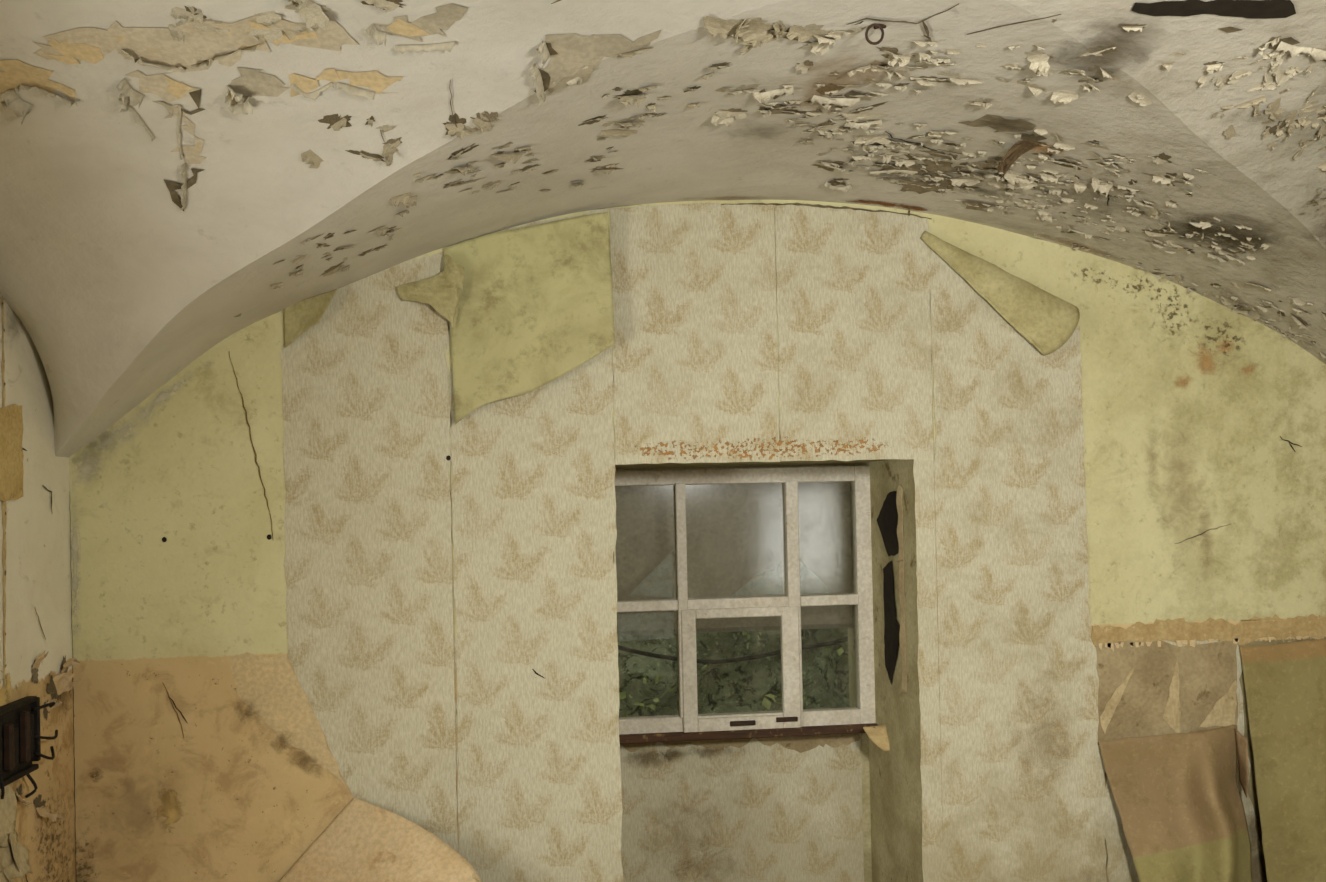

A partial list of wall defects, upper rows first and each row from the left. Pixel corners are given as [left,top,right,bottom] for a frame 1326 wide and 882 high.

peeling [0,0,468,211]
peeling [529,30,661,106]
damp [1088,32,1136,67]
flaking render [1119,0,1296,33]
peeling [270,111,559,289]
peeling [570,16,1326,360]
damp [1187,219,1259,245]
damp [1126,279,1240,353]
crack [229,351,273,538]
rust [637,437,885,460]
peeling [31,651,80,721]
peeling [0,783,65,882]